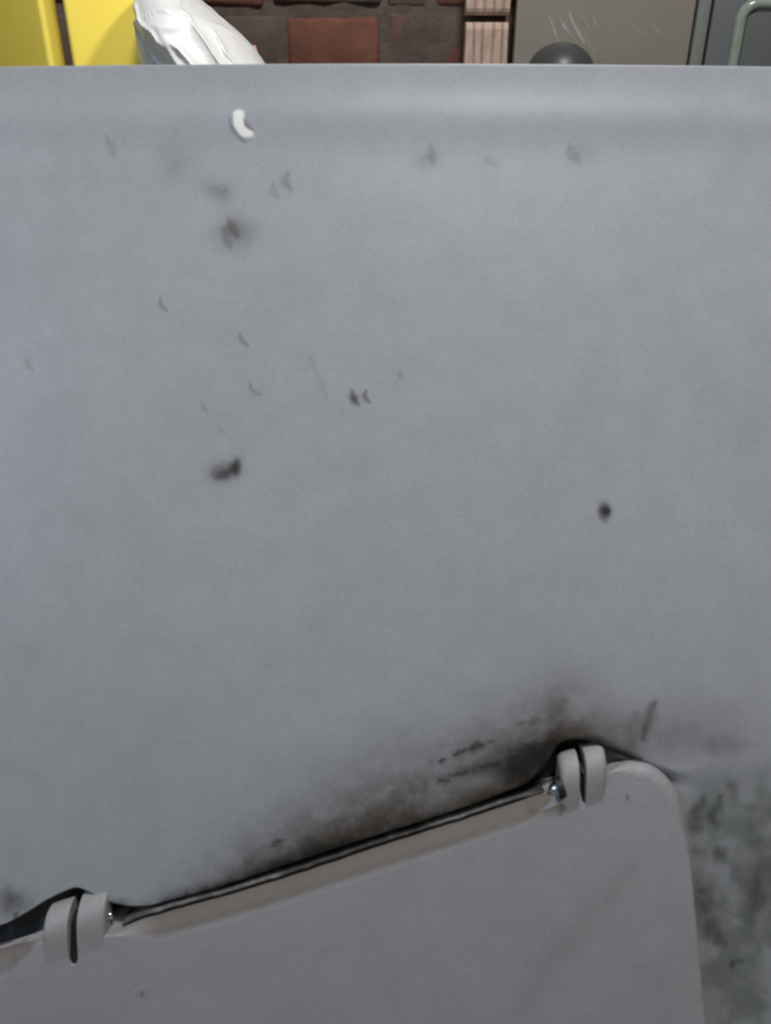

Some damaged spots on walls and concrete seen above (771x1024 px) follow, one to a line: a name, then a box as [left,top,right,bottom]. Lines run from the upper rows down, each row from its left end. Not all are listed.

damp [218,460,239,477]